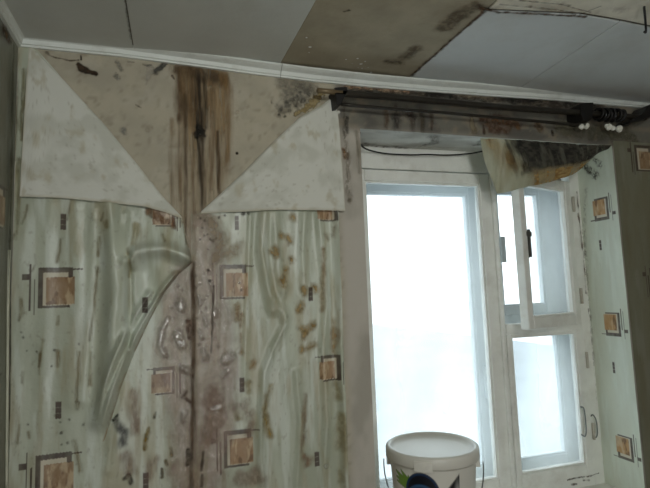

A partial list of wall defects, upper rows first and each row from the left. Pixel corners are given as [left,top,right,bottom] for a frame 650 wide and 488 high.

spalling [76,56,98,76]
water stain [171,66,228,204]